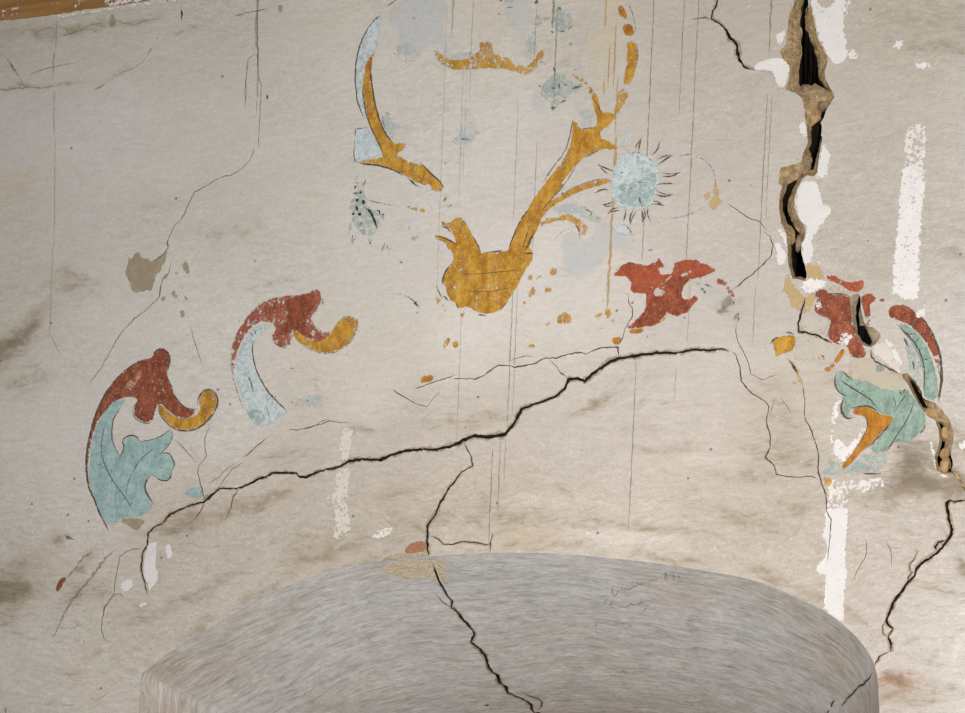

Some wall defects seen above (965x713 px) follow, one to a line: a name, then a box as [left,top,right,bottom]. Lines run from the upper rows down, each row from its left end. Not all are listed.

crack [94,0,270,377]
crack [726,0,835,343]
peeling [775,243,786,265]
peeling [783,264,827,313]
crack [101,294,832,713]
crack [827,294,965,713]